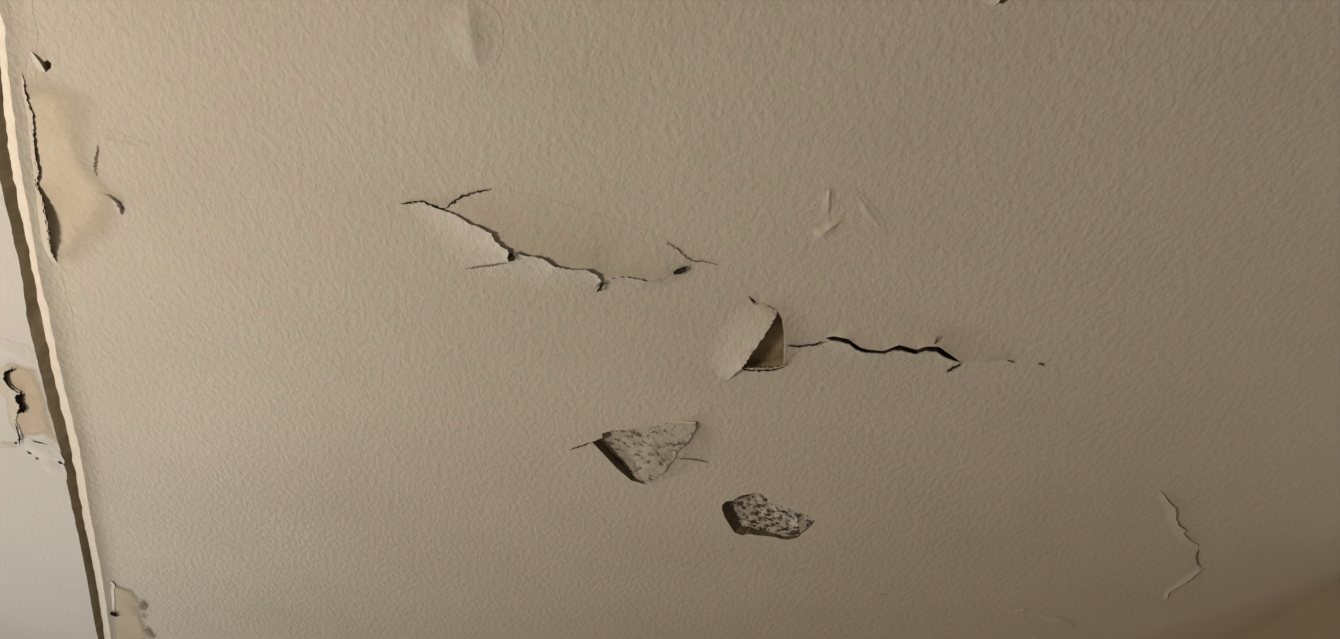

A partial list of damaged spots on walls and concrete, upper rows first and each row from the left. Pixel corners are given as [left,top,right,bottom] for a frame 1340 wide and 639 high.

peeling [20,50,150,271]
peeling [400,189,718,300]
peeling [709,296,810,382]
crack [784,314,1044,374]
peeling [0,338,67,480]
spalling [570,421,722,488]
spalling [722,492,815,540]
peeling [1155,490,1202,602]
peeling [110,581,155,639]